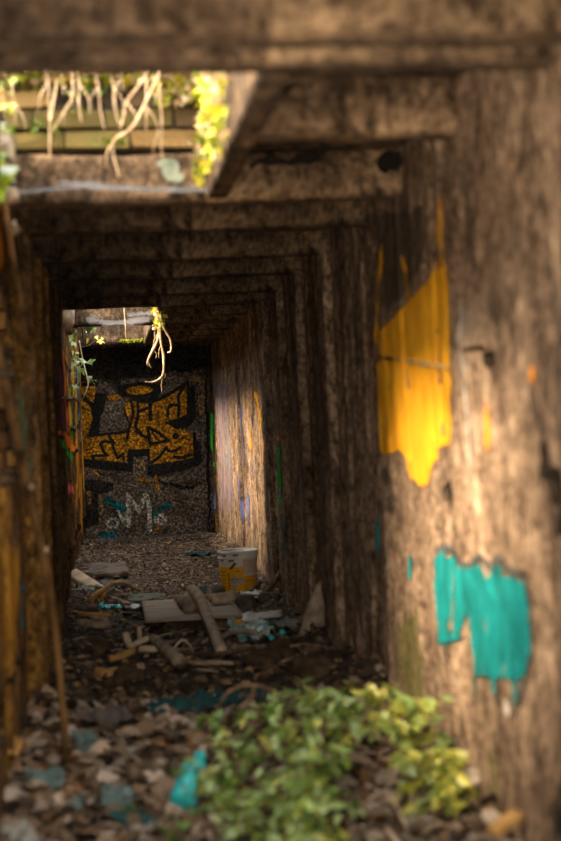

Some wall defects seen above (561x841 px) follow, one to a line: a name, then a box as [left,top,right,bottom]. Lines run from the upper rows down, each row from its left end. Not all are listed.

peeling [374,244,383,345]